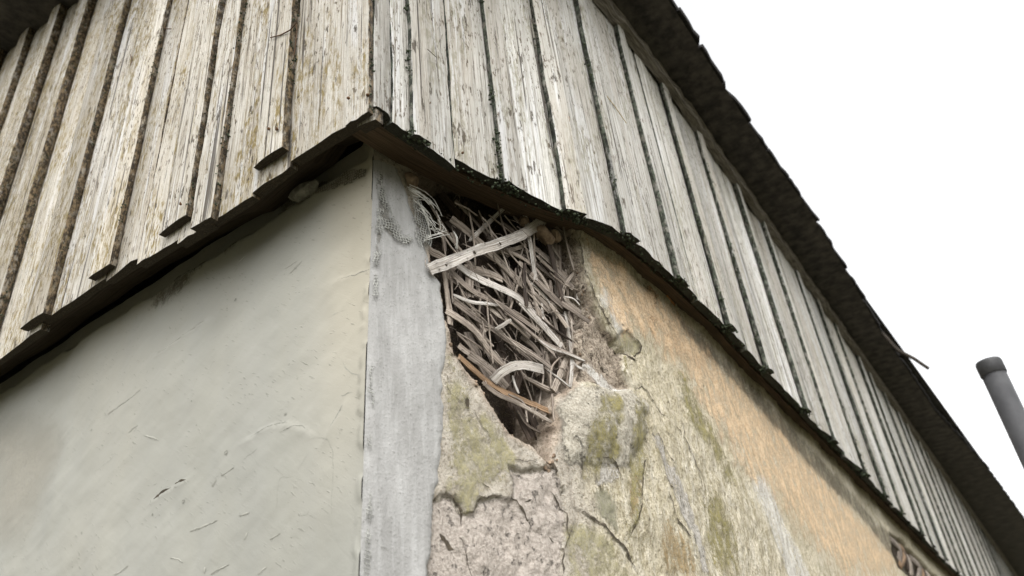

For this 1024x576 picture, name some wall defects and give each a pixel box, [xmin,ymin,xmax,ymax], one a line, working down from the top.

spalling [425,192,641,440]
crack [442,386,705,576]